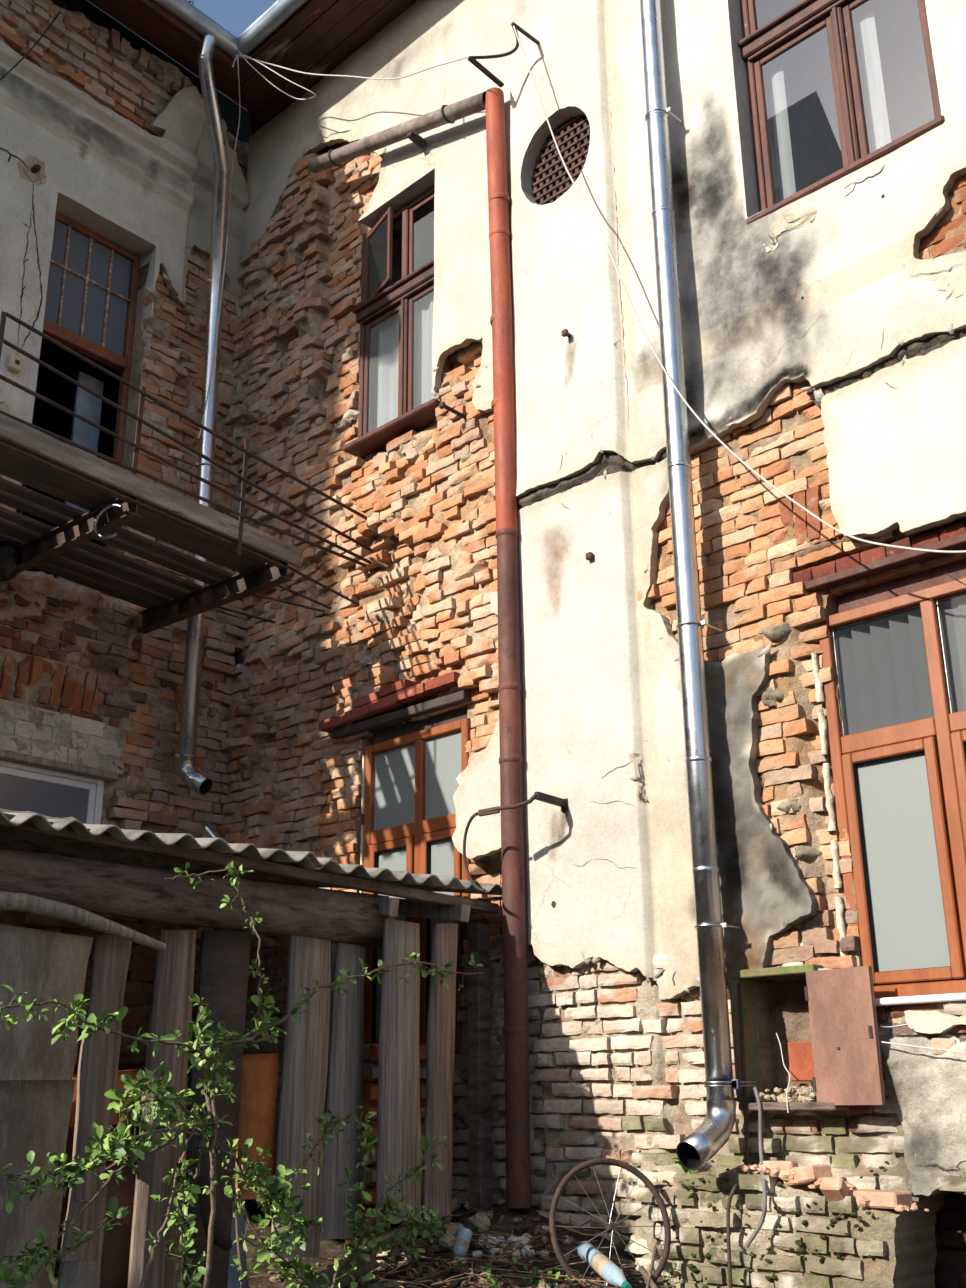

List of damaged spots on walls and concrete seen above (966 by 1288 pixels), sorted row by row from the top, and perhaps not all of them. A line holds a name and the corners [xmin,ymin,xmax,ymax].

spalling [0,0,203,137]
crack [517,93,667,510]
leakage [672,128,731,217]
crack [800,323,966,408]
spalling [901,175,966,300]
spalling [0,131,499,864]
leakage [729,845,743,885]
spalling [527,380,966,1288]
leakage [770,859,793,892]
spalling [0,909,223,1102]
spalling [243,932,289,1175]
spalling [468,851,506,1204]